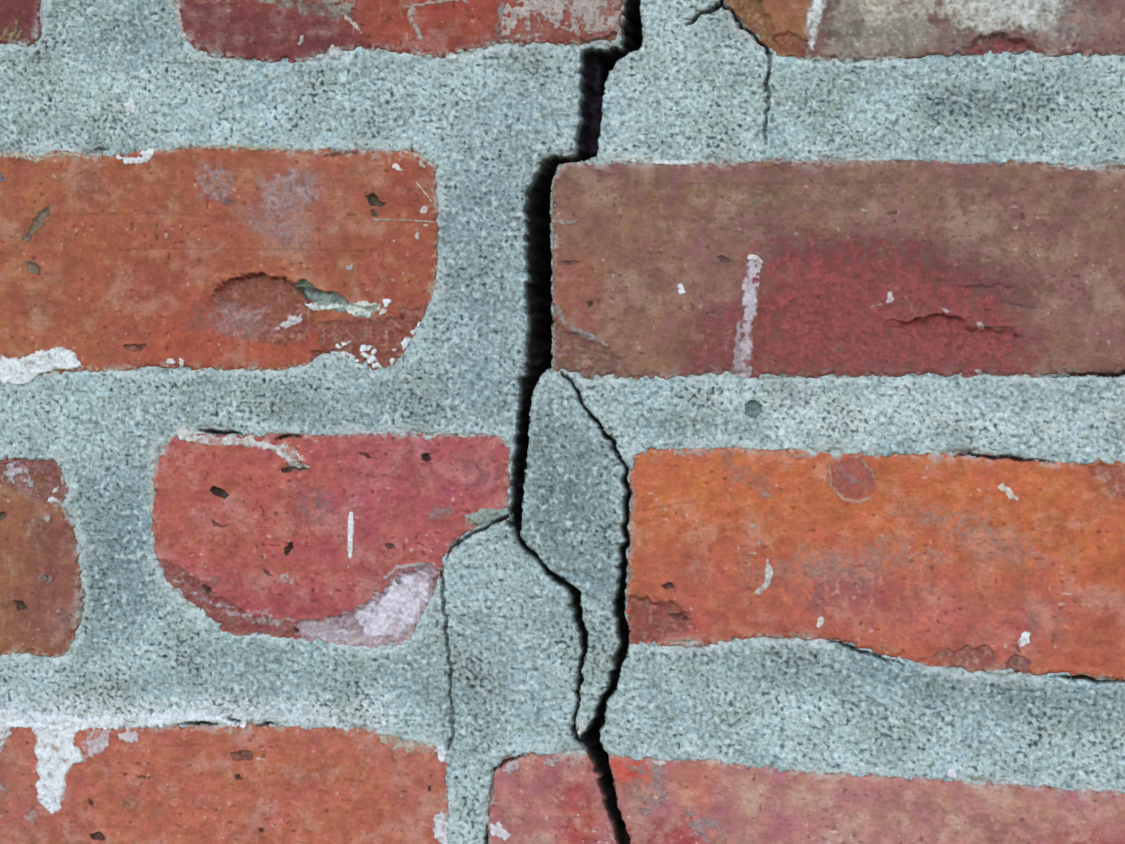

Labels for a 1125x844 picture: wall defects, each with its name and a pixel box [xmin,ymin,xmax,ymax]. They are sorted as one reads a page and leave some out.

crack [683,0,774,145]
spalling [214,274,425,367]
spalling [209,486,229,499]
spalling [281,462,309,473]
crack [439,0,644,844]
spalling [157,559,443,648]